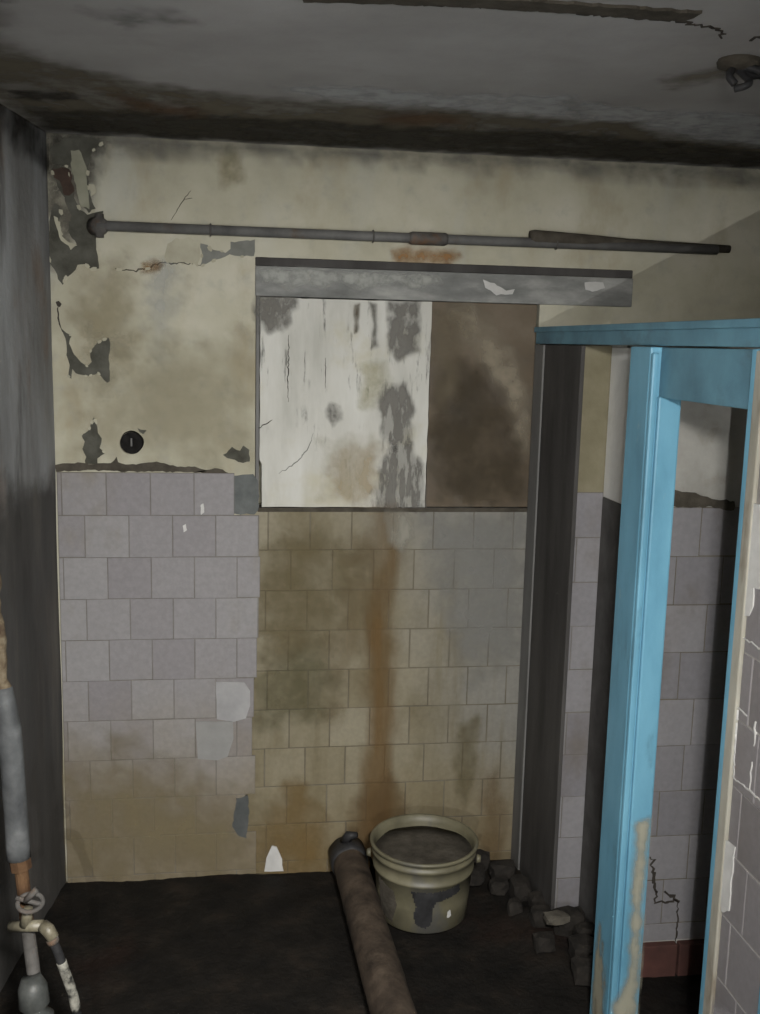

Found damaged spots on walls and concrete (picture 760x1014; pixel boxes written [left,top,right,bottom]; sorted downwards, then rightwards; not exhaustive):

spalling [303,0,702,22]
crack [576,14,726,39]
water stain [0,48,760,243]
peeling [49,136,104,285]
peeling [62,330,110,383]
water stain [450,305,528,447]
crack [649,857,680,942]